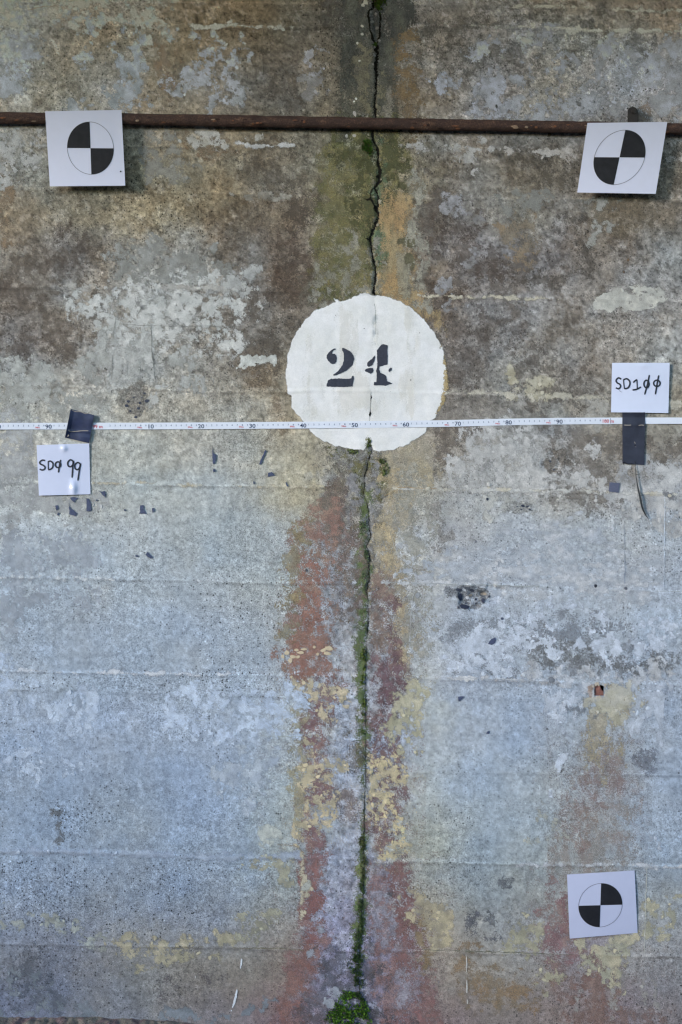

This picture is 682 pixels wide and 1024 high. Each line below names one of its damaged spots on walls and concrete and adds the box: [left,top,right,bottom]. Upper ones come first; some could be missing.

crack [365,0,382,320]
crack [358,446,540,992]